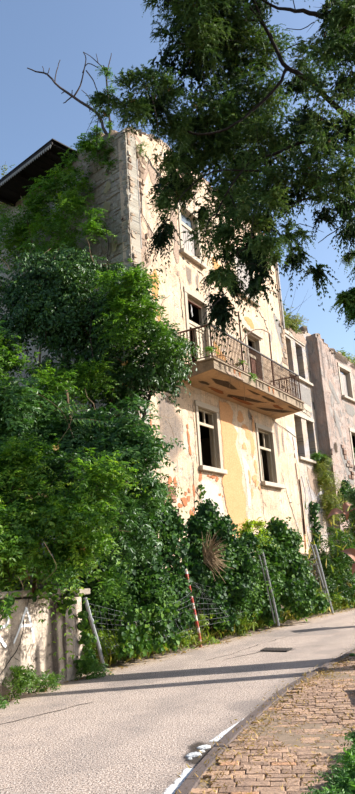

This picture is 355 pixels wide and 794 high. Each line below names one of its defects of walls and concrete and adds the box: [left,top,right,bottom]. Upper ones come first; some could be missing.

water stain [199,379,303,419]
flaking render [168,401,261,538]